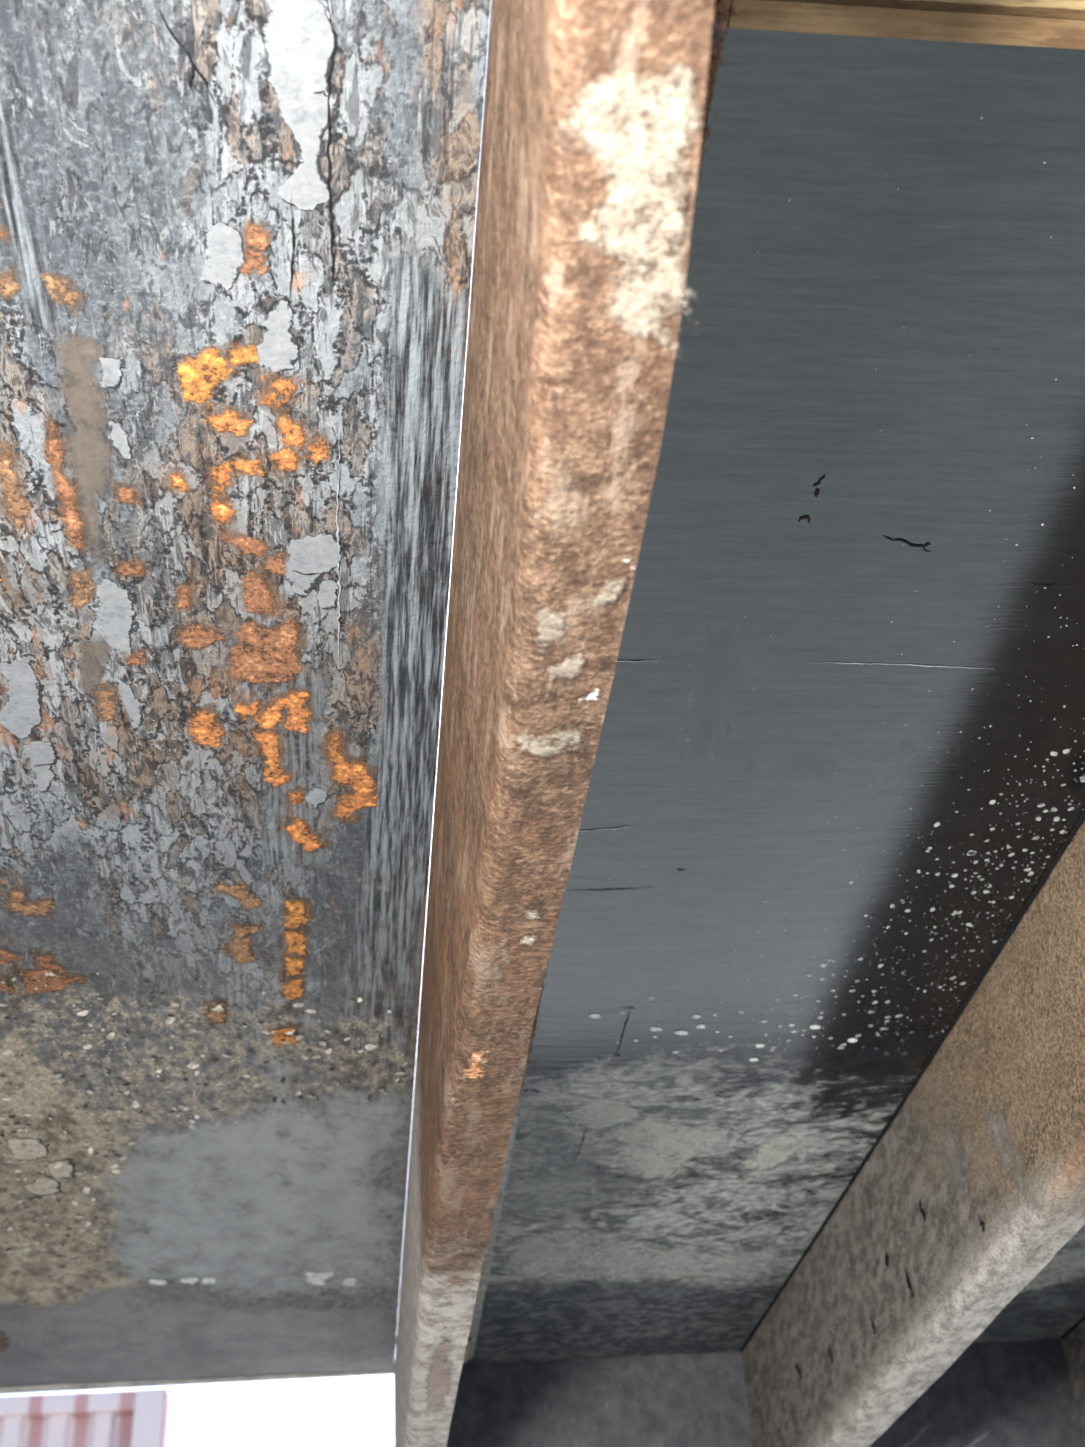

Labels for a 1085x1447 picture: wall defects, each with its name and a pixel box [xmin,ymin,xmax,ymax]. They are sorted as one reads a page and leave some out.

peeling [262,0,339,211]
rust [697,56,725,180]
rust [41,274,79,306]
peeling [256,298,300,372]
rust [176,344,379,852]
peeling [283,534,343,610]
peeling [0,657,60,792]
rust [282,898,313,1001]
damp [565,1101,724,1178]
damp [305,1272,357,1286]
damp [506,1230,761,1280]
damp [1021,1255,1085,1291]